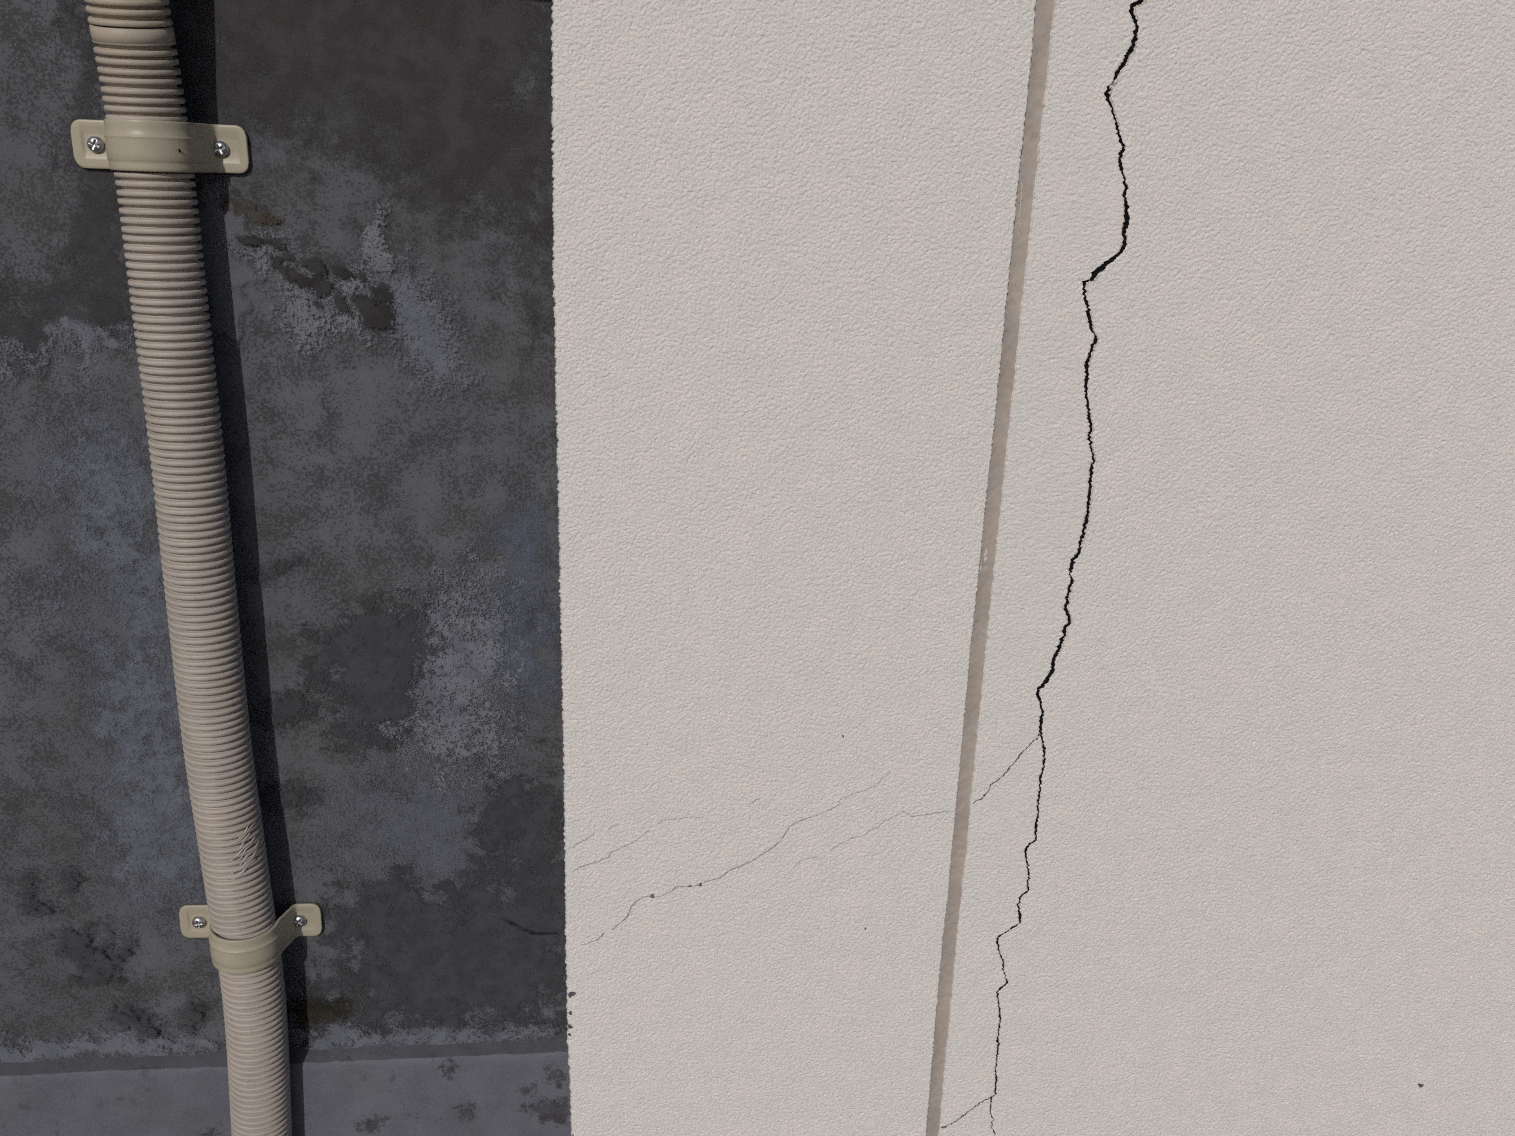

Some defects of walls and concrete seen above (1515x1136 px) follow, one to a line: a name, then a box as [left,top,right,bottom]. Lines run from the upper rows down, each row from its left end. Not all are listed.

damp [52,0,101,126]
damp [0,161,219,1063]
damp [194,173,262,341]
damp [215,386,568,1080]
crack [500,0,1147,1135]